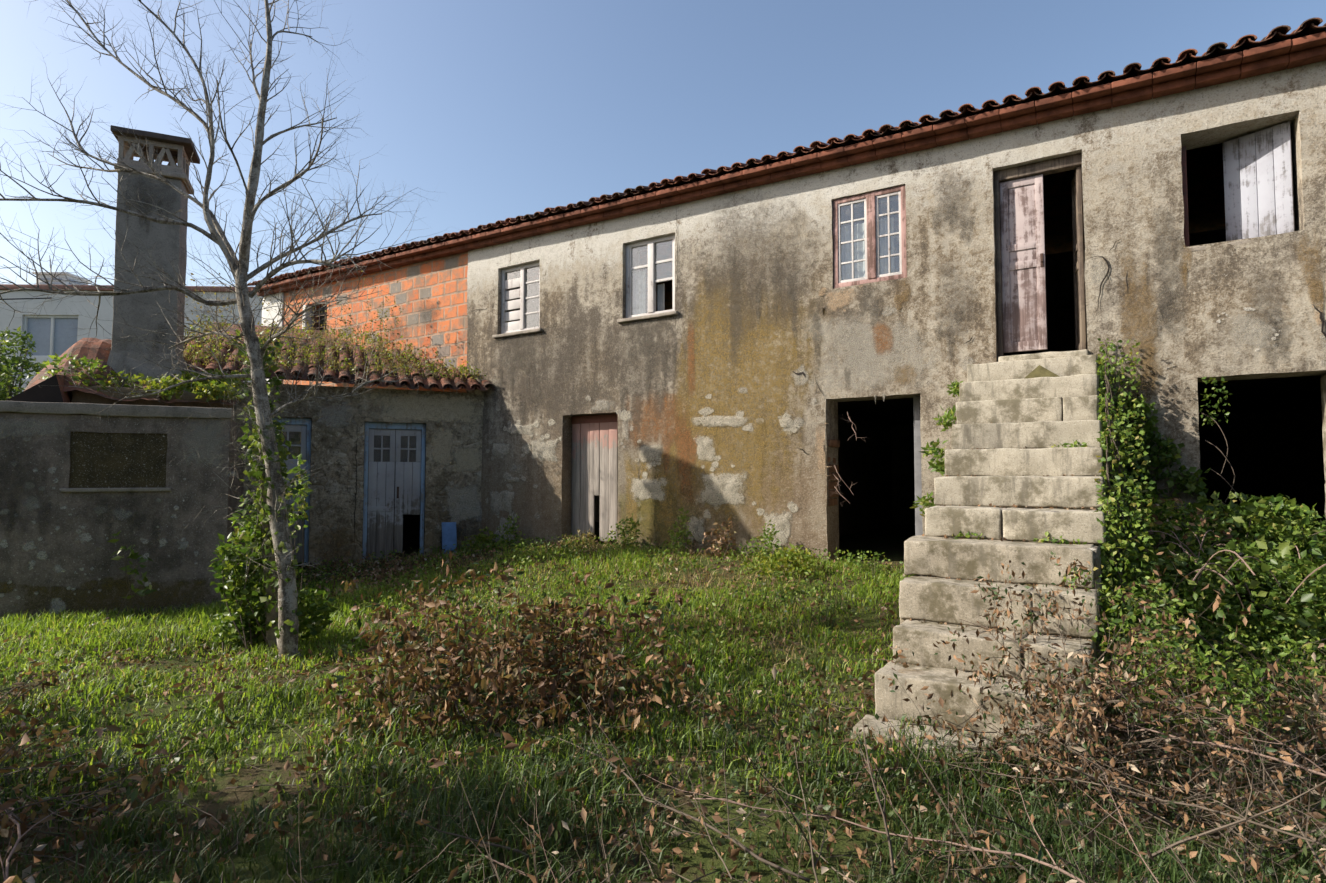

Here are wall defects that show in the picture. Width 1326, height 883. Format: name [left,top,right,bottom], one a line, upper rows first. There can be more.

crack [1091,240,1128,310]
spalling [686,394,803,554]